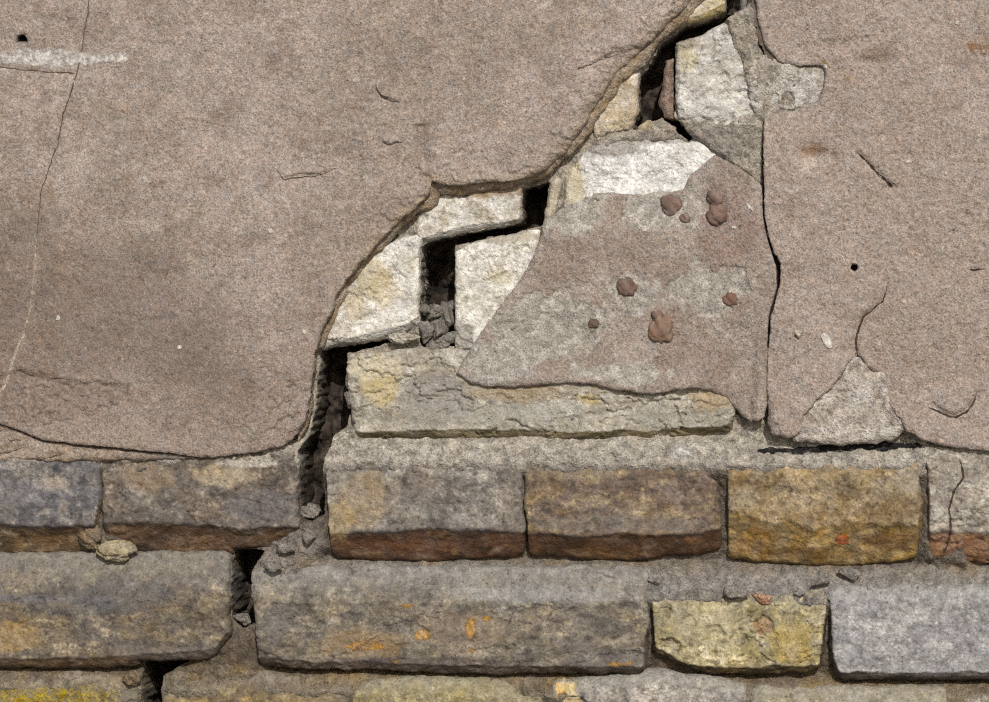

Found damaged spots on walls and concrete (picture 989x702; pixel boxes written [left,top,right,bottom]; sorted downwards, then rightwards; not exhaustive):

peeling [578,43,648,68]
crack [639,0,776,141]
crack [0,1,89,393]
crack [419,188,548,346]
crack [761,123,781,364]
crack [0,424,206,459]
crack [313,341,387,516]
crack [944,460,965,551]
crack [246,549,264,618]
crack [159,660,188,702]